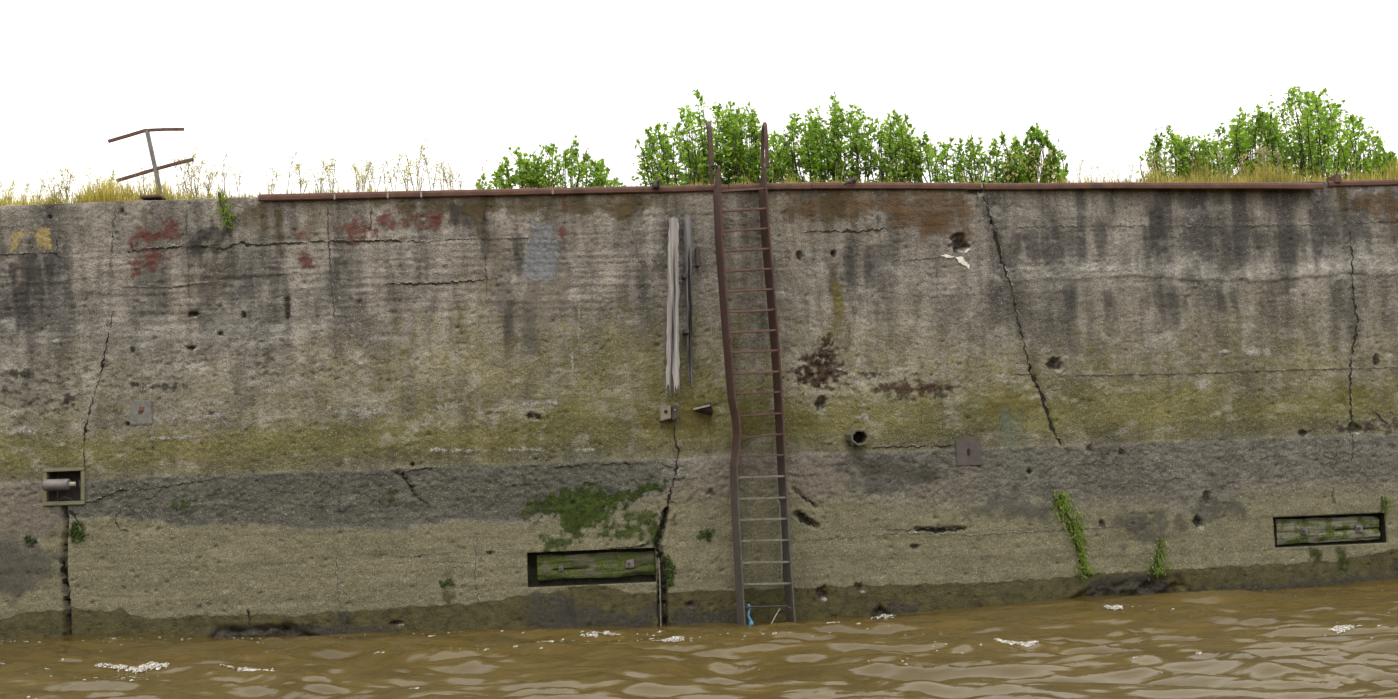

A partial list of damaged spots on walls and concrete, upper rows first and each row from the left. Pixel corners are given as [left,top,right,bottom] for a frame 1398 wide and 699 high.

corrosion [372,193,653,232]
crack [83,199,530,466]
damp [326,406,384,419]
crack [338,467,432,513]
crack [527,426,680,625]
crack [966,190,1398,503]